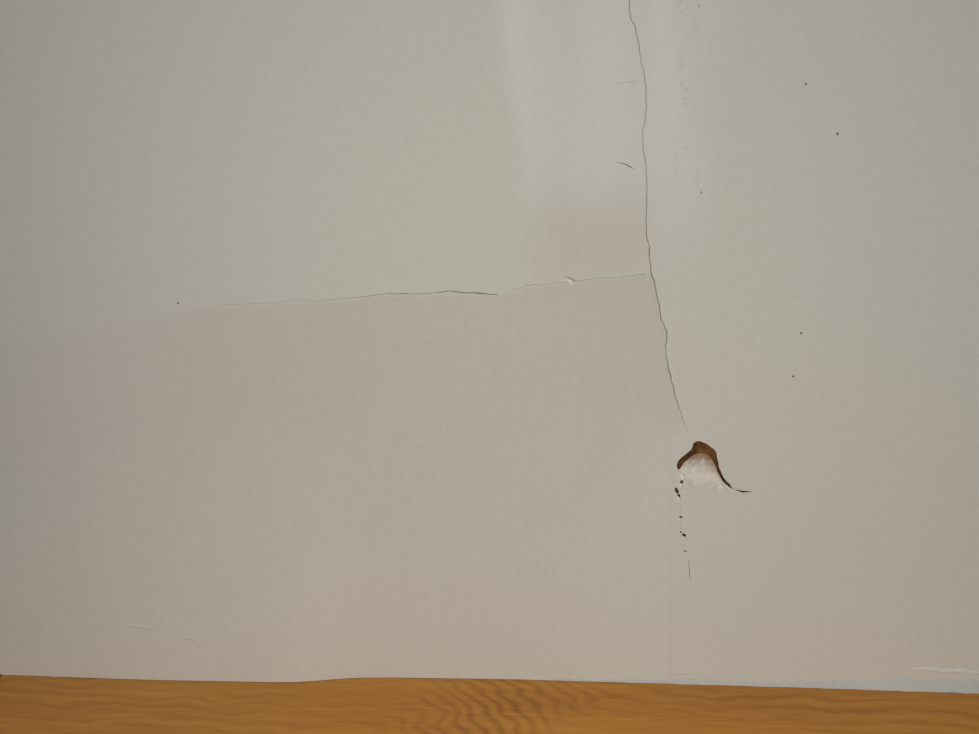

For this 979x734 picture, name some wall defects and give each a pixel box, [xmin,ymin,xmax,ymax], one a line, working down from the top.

crack [278,0,688,431]
spalling [675,441,750,501]